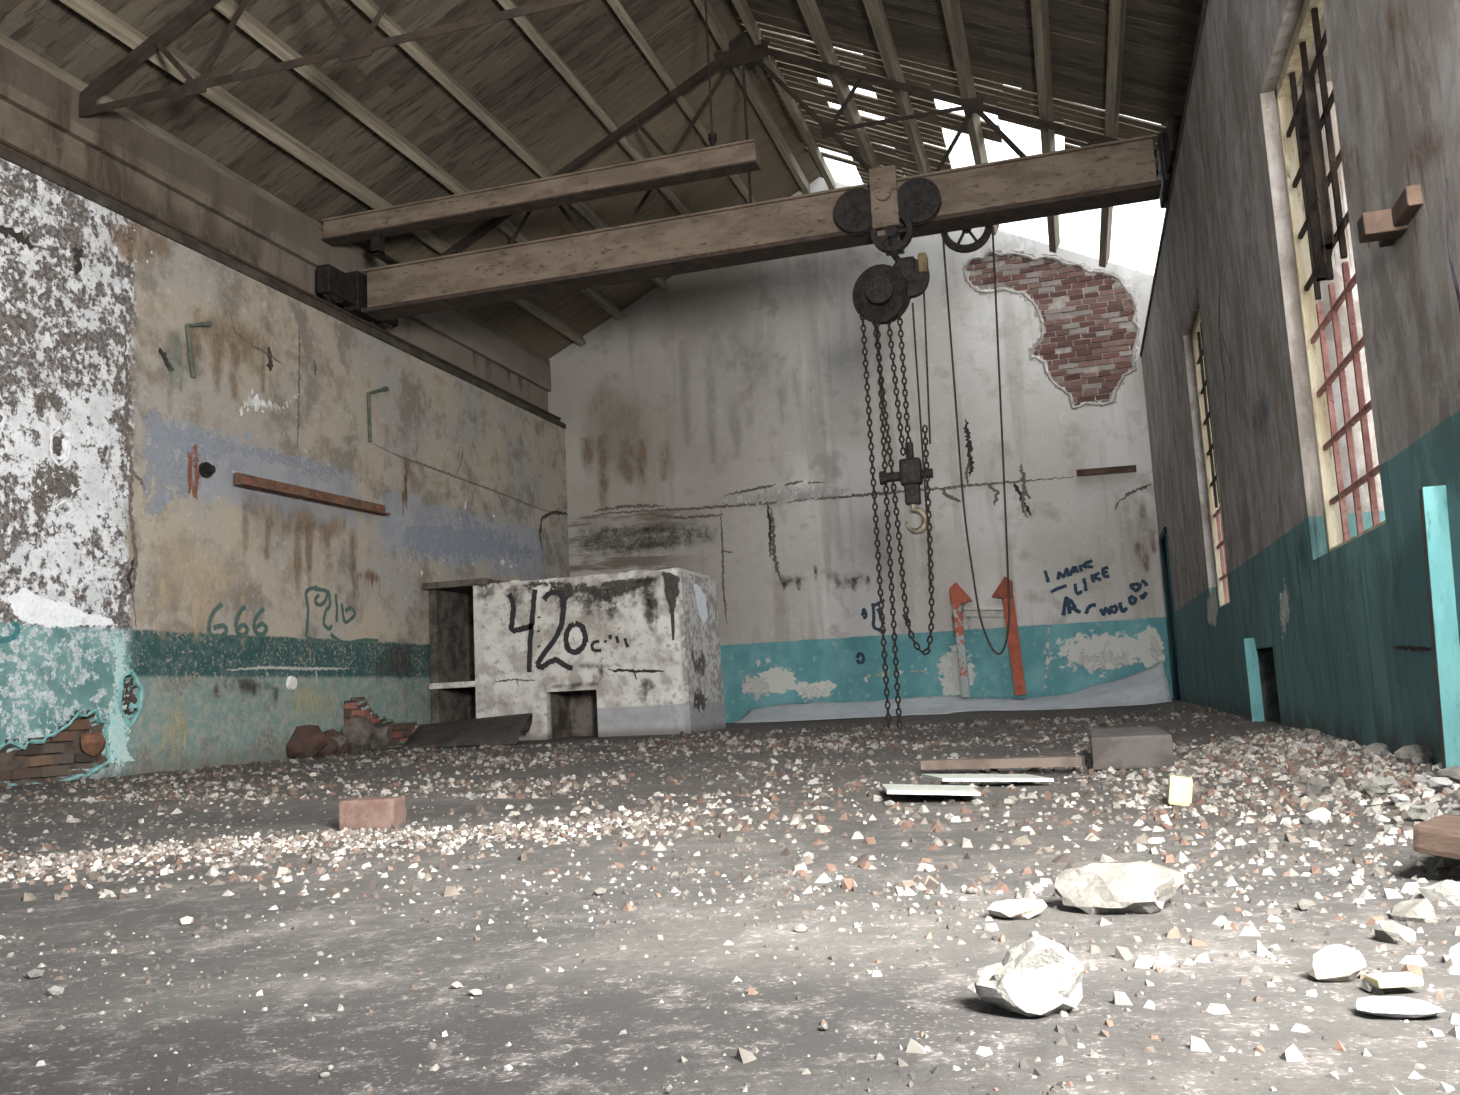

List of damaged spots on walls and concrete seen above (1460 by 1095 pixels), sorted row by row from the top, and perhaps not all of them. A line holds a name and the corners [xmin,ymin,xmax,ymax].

peeling [0,309,85,348]
spalling [962,250,1141,410]
peeling [22,377,89,533]
peeling [0,529,10,570]
spalling [0,586,144,786]
peeling [741,658,777,701]